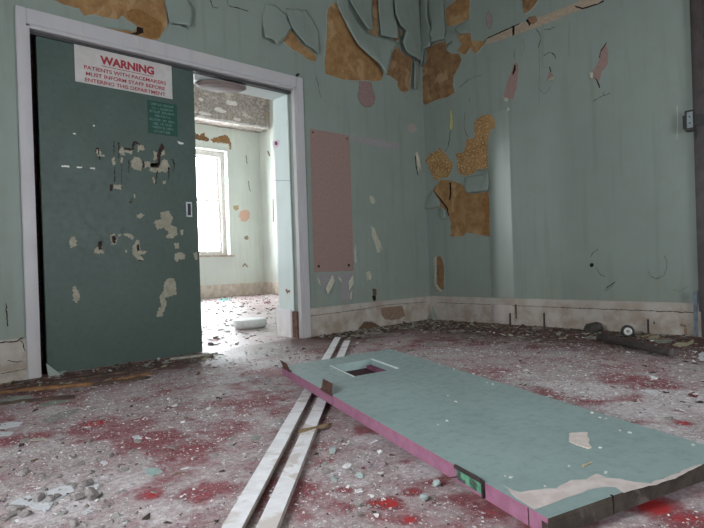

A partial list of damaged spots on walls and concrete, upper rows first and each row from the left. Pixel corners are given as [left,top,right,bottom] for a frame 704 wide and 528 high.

spalling [50,0,193,41]
spalling [262,0,603,111]
spalling [195,131,232,151]
spalling [61,141,170,191]
spalling [414,113,496,238]
spalling [233,204,251,223]
spalling [154,211,186,262]
spalling [433,254,445,293]
spalling [156,278,177,317]
peeling [380,306,405,320]